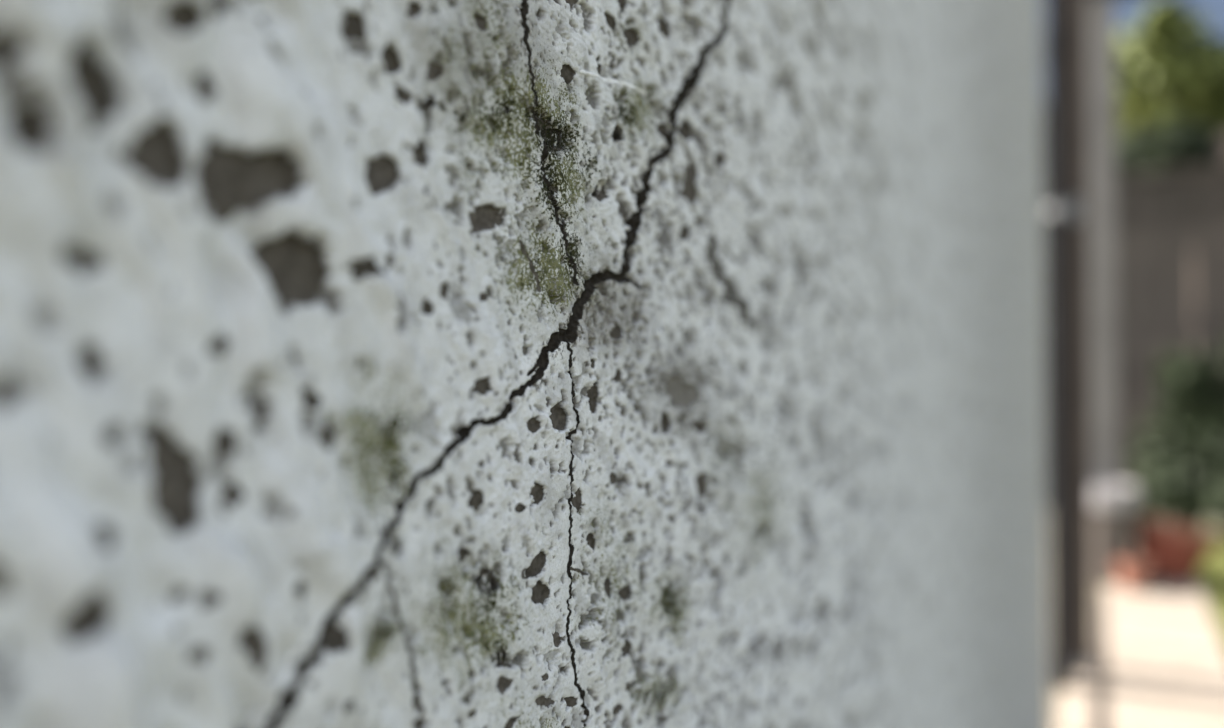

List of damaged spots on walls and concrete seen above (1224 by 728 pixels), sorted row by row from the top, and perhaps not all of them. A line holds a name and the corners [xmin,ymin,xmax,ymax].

crack [260,0,733,728]
crack [705,235,758,329]